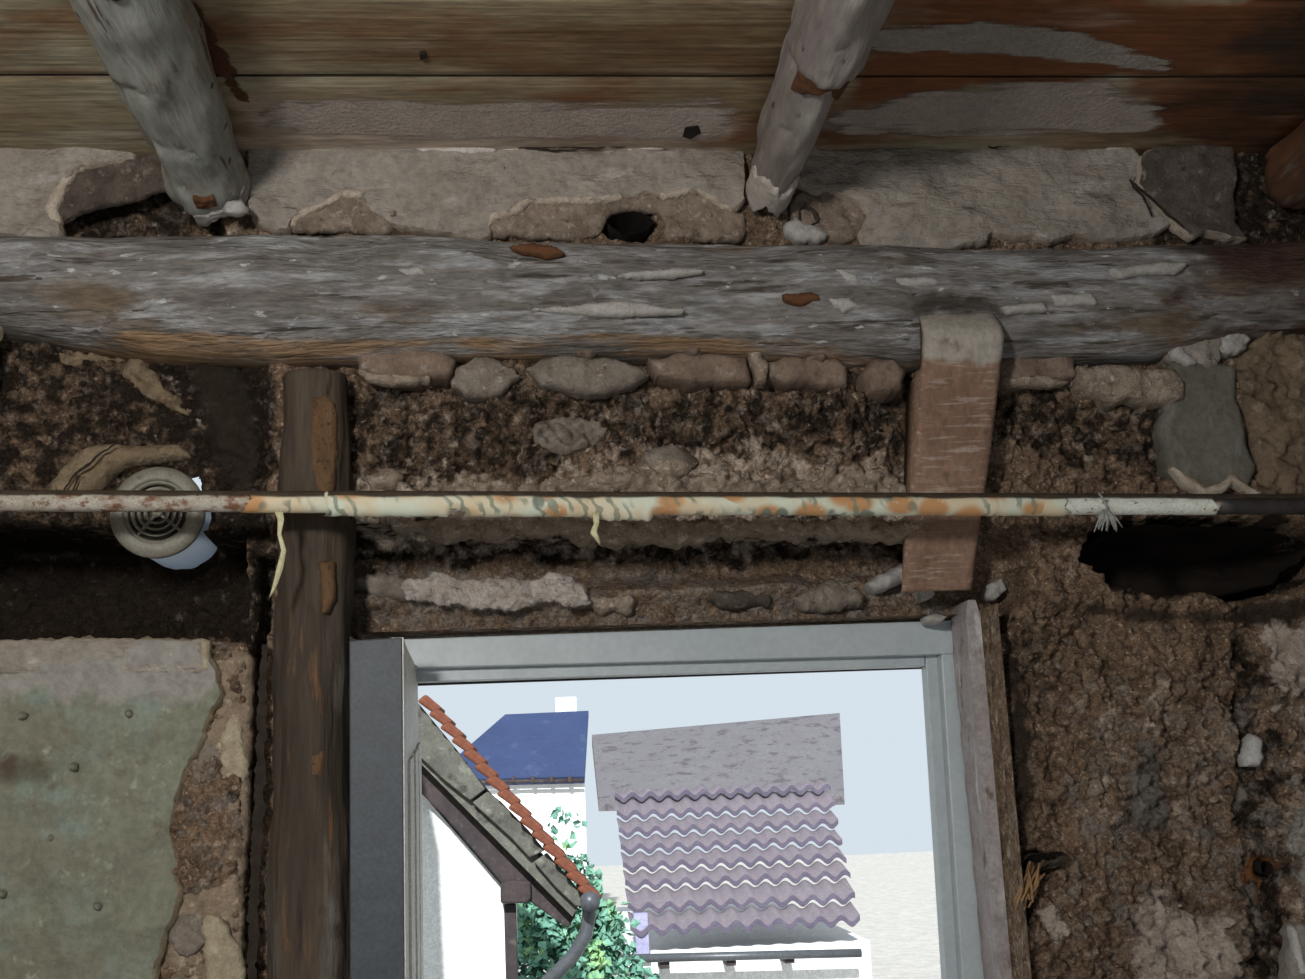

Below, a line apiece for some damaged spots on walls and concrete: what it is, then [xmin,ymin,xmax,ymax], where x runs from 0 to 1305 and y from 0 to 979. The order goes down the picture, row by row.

spalling [0,153,166,237]
spalling [247,153,747,245]
spalling [1078,524,1305,600]
spalling [152,646,256,979]